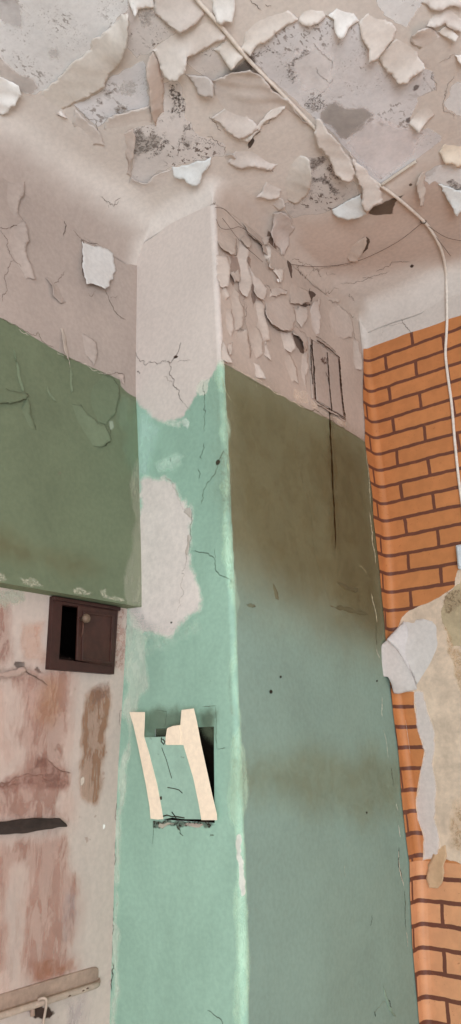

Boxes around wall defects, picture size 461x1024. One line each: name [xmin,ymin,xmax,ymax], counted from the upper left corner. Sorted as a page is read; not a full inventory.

peeling [0,0,461,388]
peeling [74,478,201,637]
crack [136,347,376,563]
flaking render [441,583,461,646]